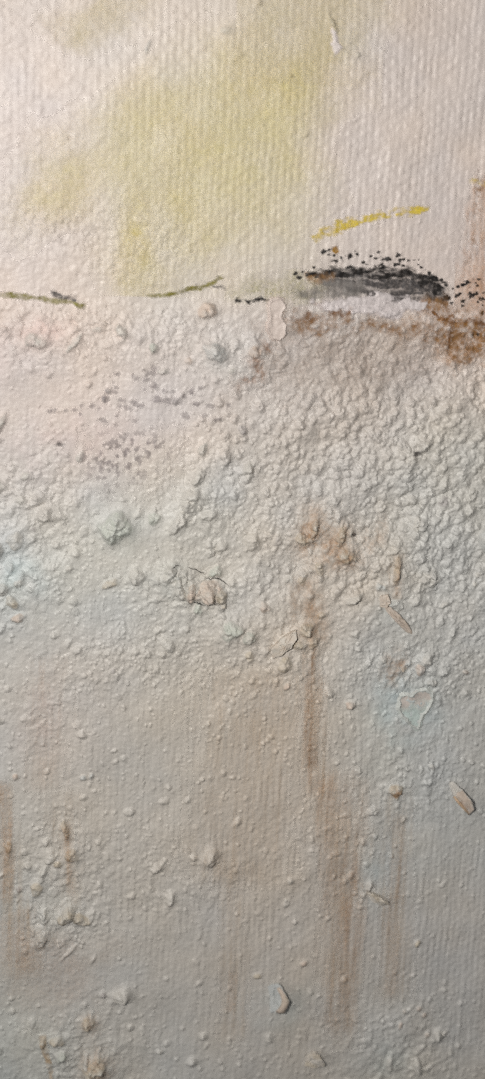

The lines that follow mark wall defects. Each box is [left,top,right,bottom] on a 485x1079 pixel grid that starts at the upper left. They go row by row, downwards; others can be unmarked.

leakage [308,265,446,295]
peeling [265,296,288,342]
rust [425,298,485,362]